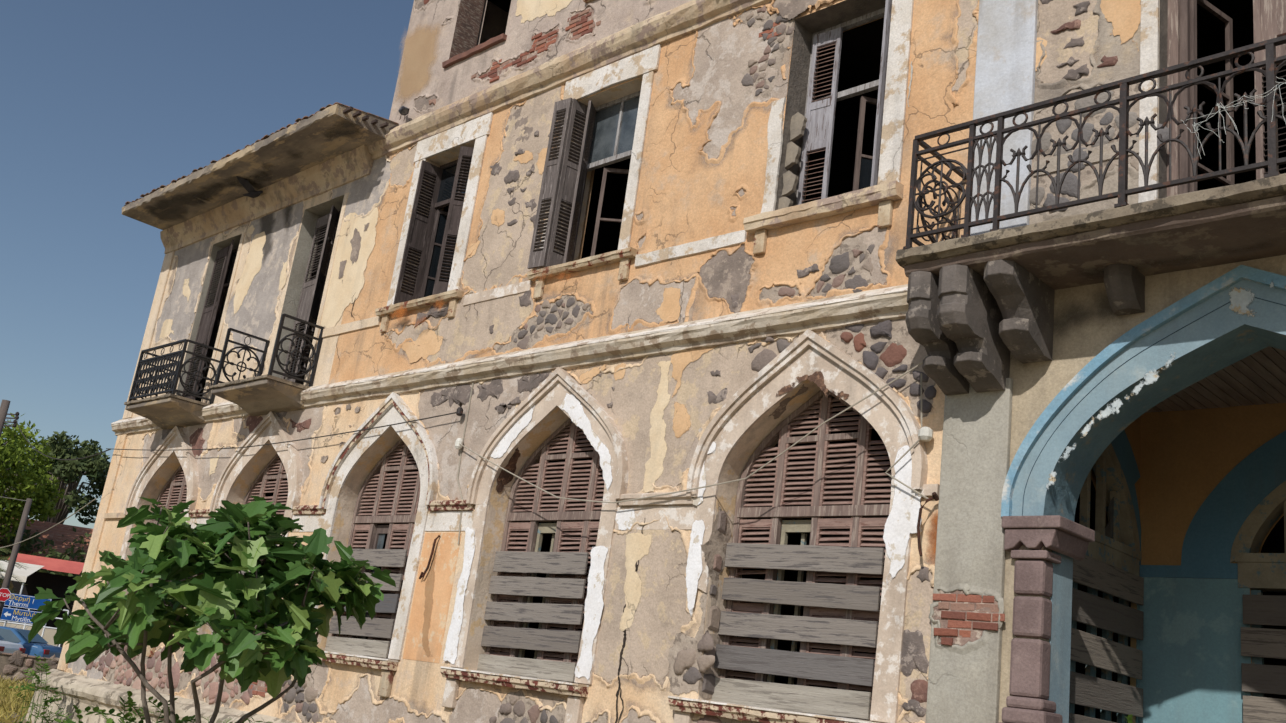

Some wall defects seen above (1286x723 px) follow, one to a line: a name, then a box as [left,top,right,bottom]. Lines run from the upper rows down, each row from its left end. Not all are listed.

flaking render [471,0,601,84]
flaking render [667,0,833,165]
flaking render [384,84,892,367]
peeling [1229,281,1286,317]
flaking render [141,404,360,502]
flaking render [416,319,943,723]
flaking render [883,445,1005,723]
peeling [1046,352,1175,489]
flaking render [64,645,567,723]
crack [615,604,628,723]